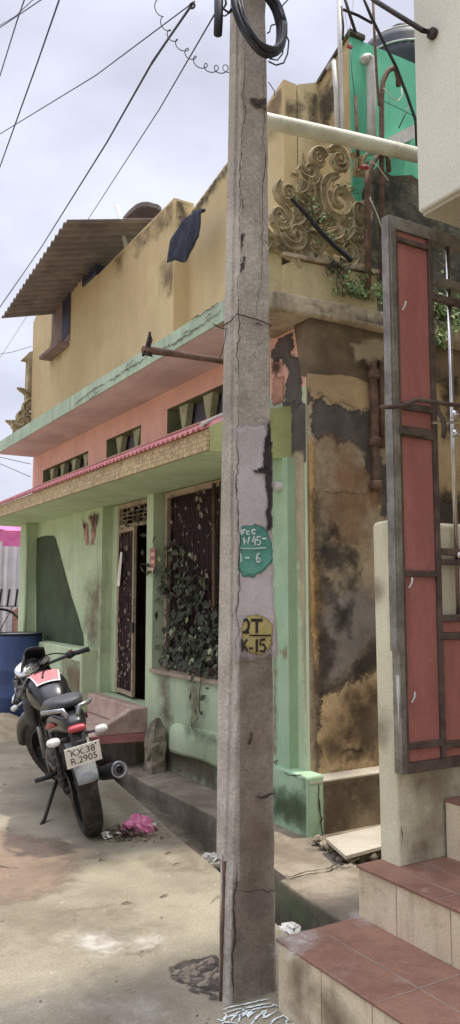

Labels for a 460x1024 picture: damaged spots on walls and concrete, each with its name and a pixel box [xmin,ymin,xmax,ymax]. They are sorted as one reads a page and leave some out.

water stain [137,167,228,242]
water stain [268,85,334,125]
crack [232,417,242,657]
peeling [271,333,387,774]
water stain [316,526,378,756]
crack [231,858,359,1001]